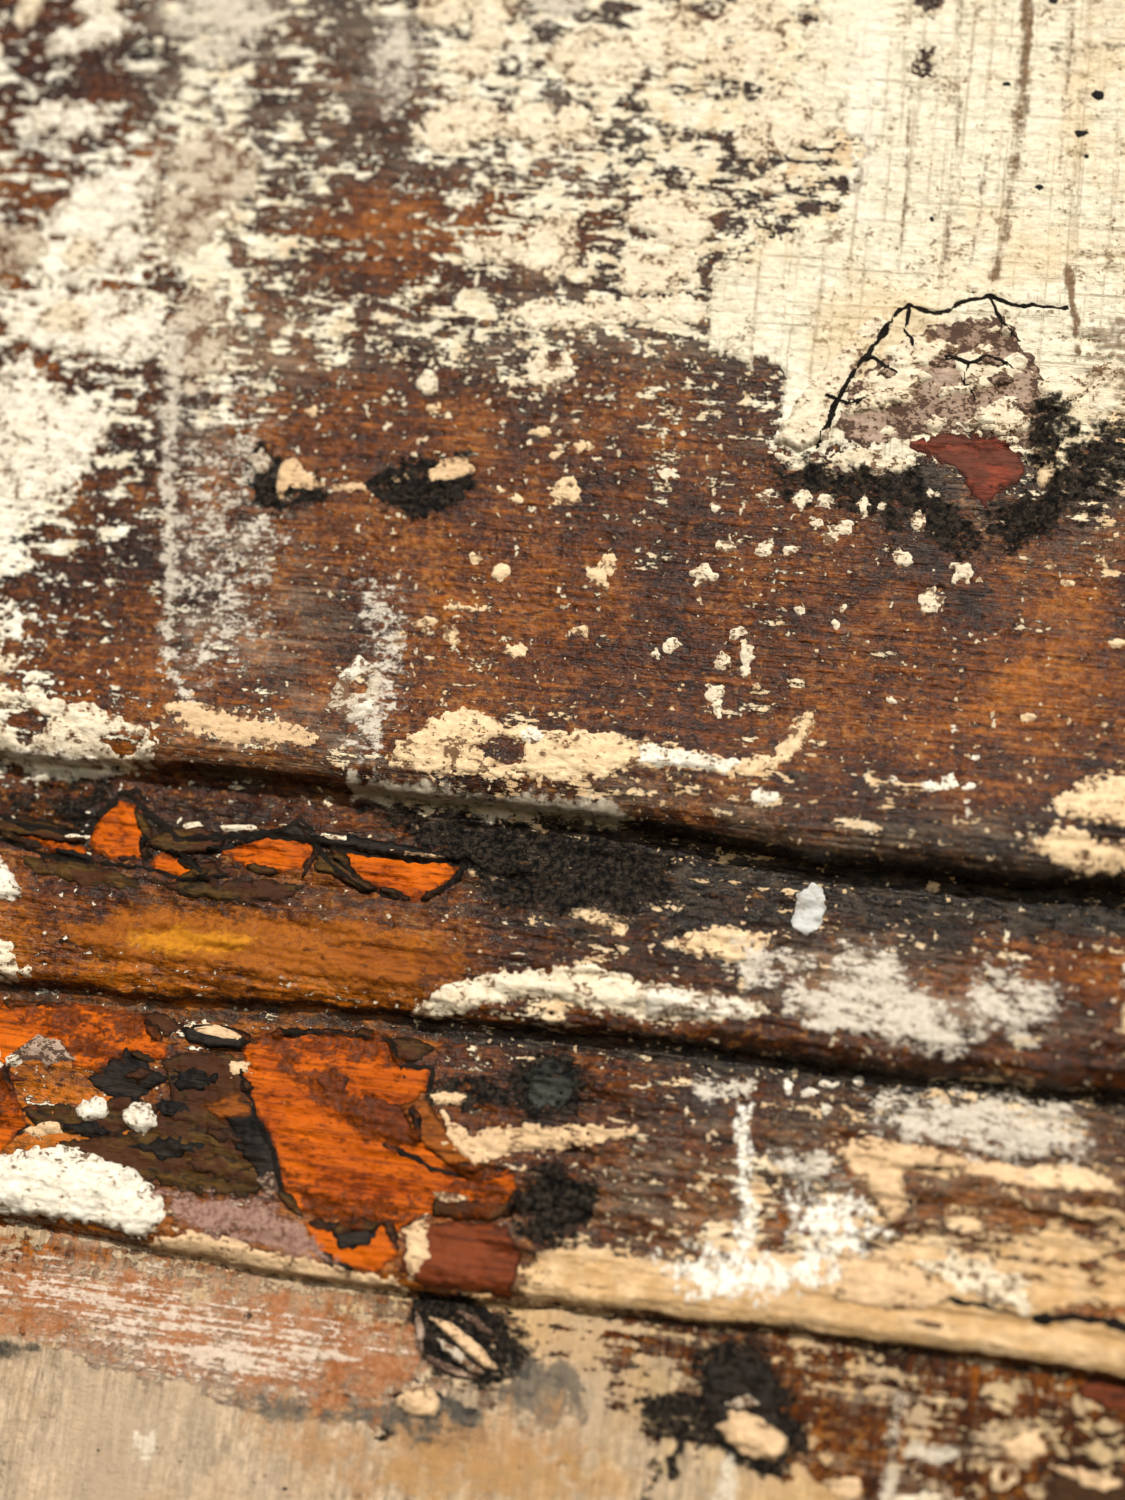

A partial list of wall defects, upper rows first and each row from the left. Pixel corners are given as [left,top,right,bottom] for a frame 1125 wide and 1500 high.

crack [814,293,1069,448]
peeling [767,316,1125,489]
spalling [234,439,476,521]
peeling [339,655,377,684]
peeling [638,742,741,776]
peeling [0,799,503,906]
crack [0,787,509,901]
crack [1099,822,1125,834]
peeling [644,984,757,1018]
peeling [0,999,639,1458]
crack [948,1295,1125,1333]
peeling [997,1429,1122,1492]